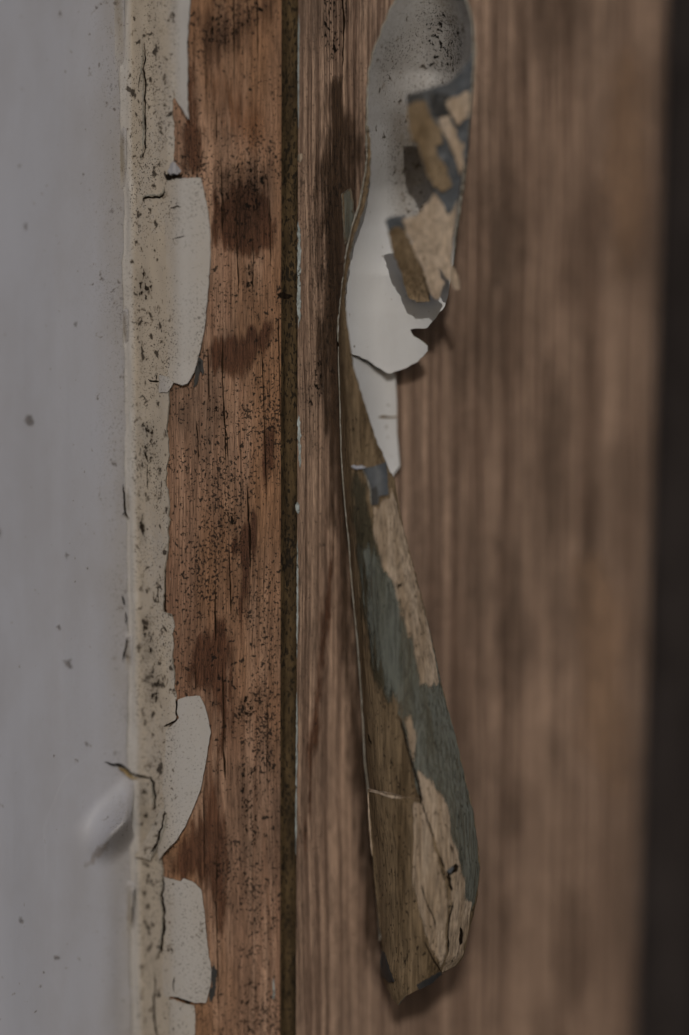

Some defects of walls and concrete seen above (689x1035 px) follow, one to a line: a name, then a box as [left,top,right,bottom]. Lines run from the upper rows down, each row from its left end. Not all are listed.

peeling [171,0,191,120]
peeling [159,161,211,393]
crack [122,451,148,518]
peeling [337,0,480,1005]
crack [121,595,129,659]
peeling [135,695,211,860]
crack [163,669,196,727]
crack [203,319,281,1016]
crack [106,762,192,1035]
peeling [162,877,217,1035]